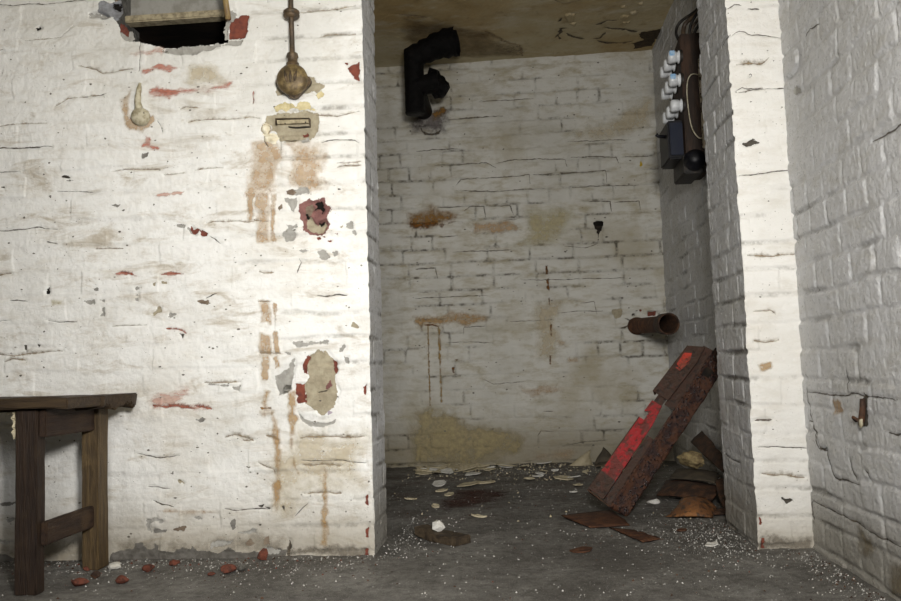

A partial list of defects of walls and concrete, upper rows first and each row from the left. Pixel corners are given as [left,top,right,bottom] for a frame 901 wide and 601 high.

spalling [89,0,250,55]
flaking render [632,29,661,49]
spalling [278,187,357,242]
rust [410,209,453,229]
peeling [299,249,338,260]
peeling [275,340,329,395]
rust [415,314,484,406]
damp [414,409,520,464]
crack [767,370,898,485]